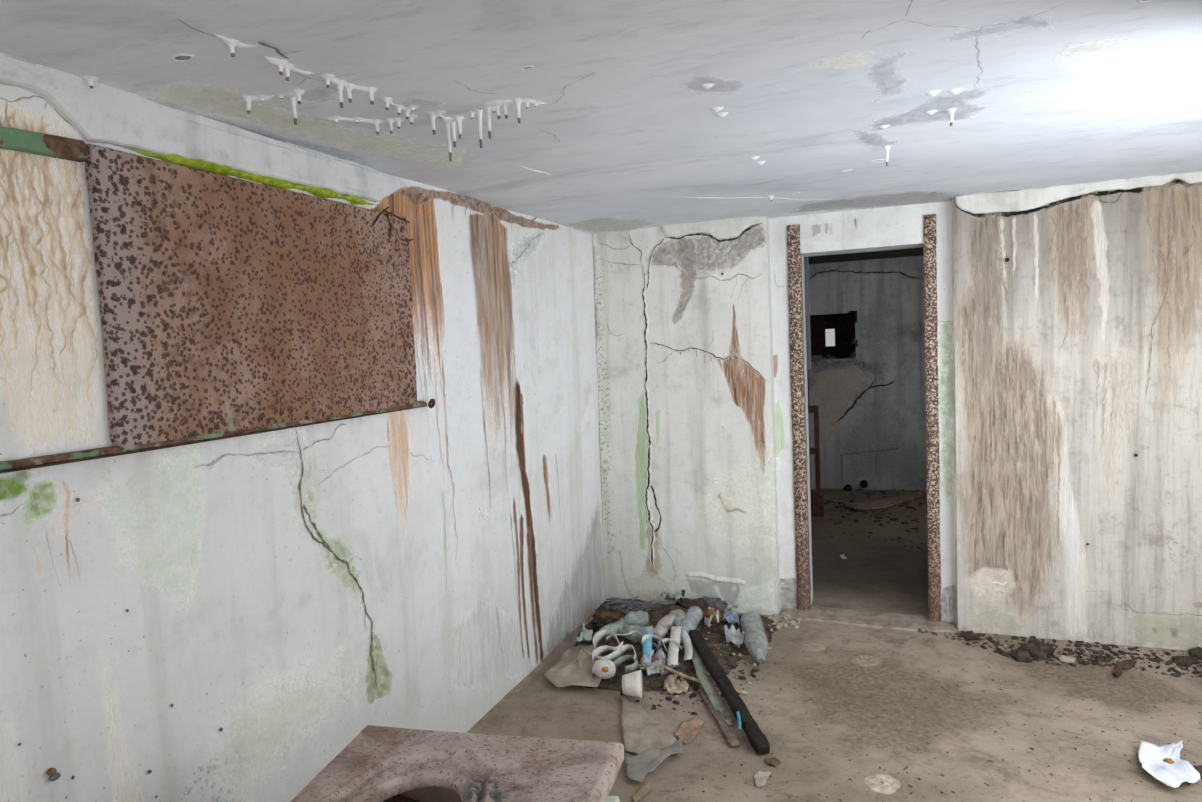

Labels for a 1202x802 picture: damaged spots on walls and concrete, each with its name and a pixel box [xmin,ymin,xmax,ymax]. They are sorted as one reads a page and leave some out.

damp [162,34,546,162]
damp [0,149,98,387]
crack [905,179,1202,218]
damp [1034,198,1108,332]
damp [1144,182,1202,364]
rust [371,187,560,663]
crack [602,223,765,579]
rust [723,305,778,473]
damp [956,214,1084,634]
damp [34,482,79,575]
crack [296,432,379,694]
damp [941,585,957,624]